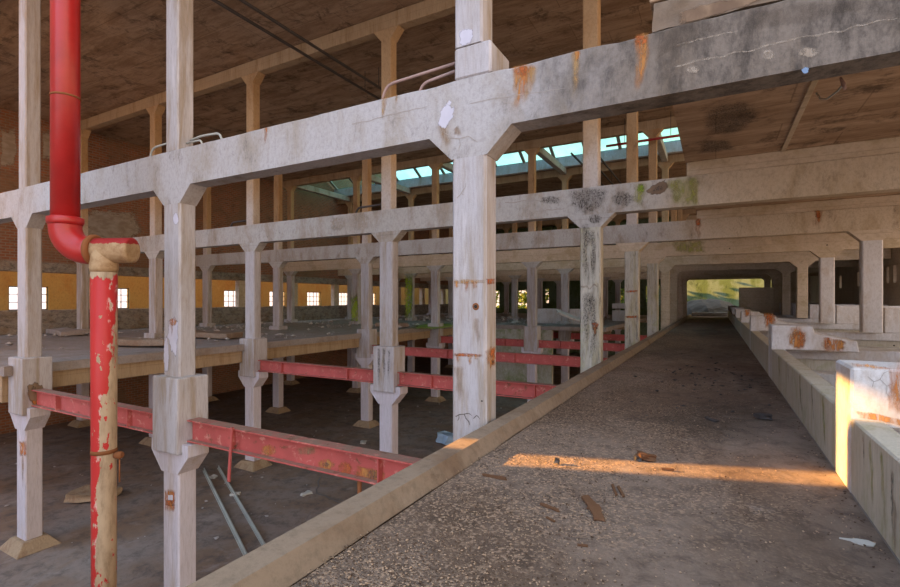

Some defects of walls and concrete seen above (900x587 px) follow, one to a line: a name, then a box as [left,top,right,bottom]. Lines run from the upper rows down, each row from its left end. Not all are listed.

peeling [459,29,473,46]
rust [636,35,647,78]
rust [514,65,535,101]
peeling [438,100,454,129]
mould [572,190,604,272]
peeling [164,318,178,371]
rust [455,348,495,368]
rust [789,329,805,348]
rust [824,338,844,351]
rust [165,491,175,510]